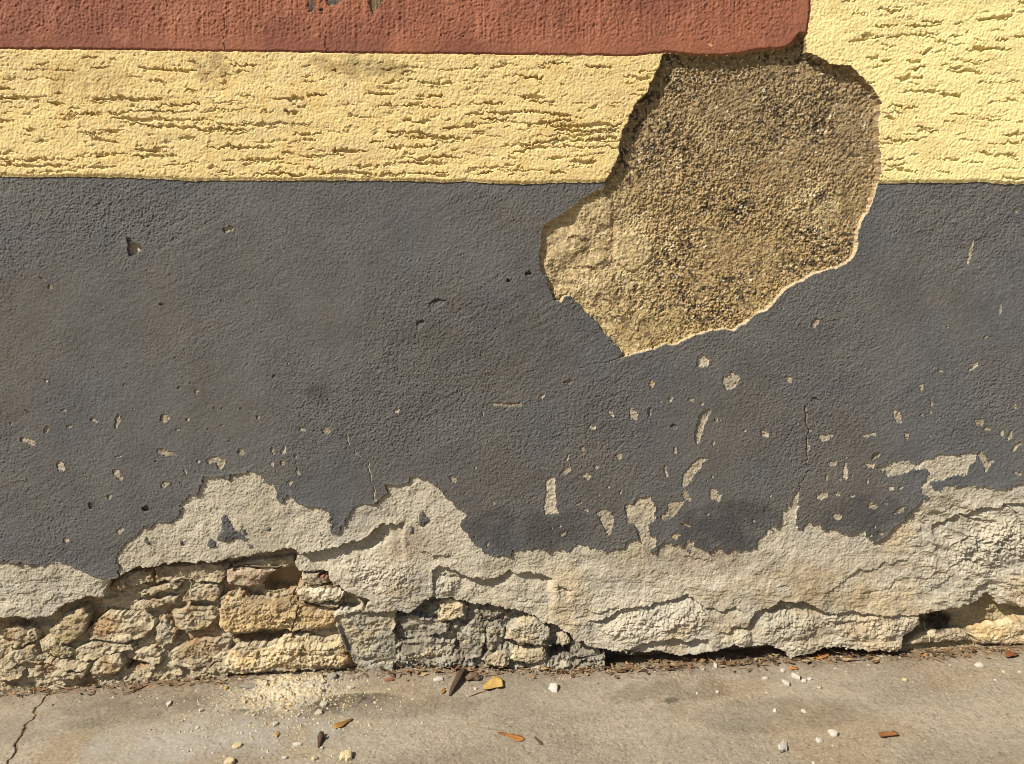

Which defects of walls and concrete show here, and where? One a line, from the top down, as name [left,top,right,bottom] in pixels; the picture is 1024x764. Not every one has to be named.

flaking render [539,33,882,362]
peeling [0,445,1024,692]
crack [799,405,810,491]
peeling [797,422,855,500]